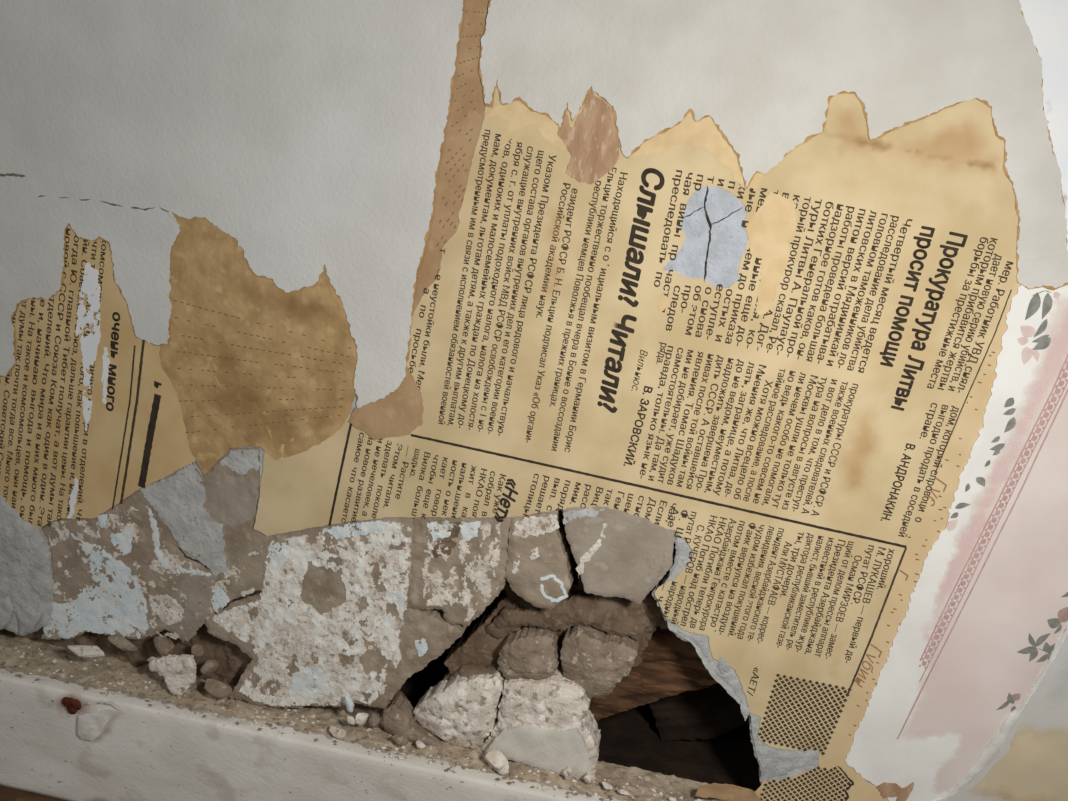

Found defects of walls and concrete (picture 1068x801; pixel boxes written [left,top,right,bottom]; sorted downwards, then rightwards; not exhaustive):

crack [0,173,169,212]
crack [683,186,743,282]
peeling [0,505,571,716]
peeling [540,523,607,602]
spalling [597,542,815,792]
leakage [973,729,1068,801]